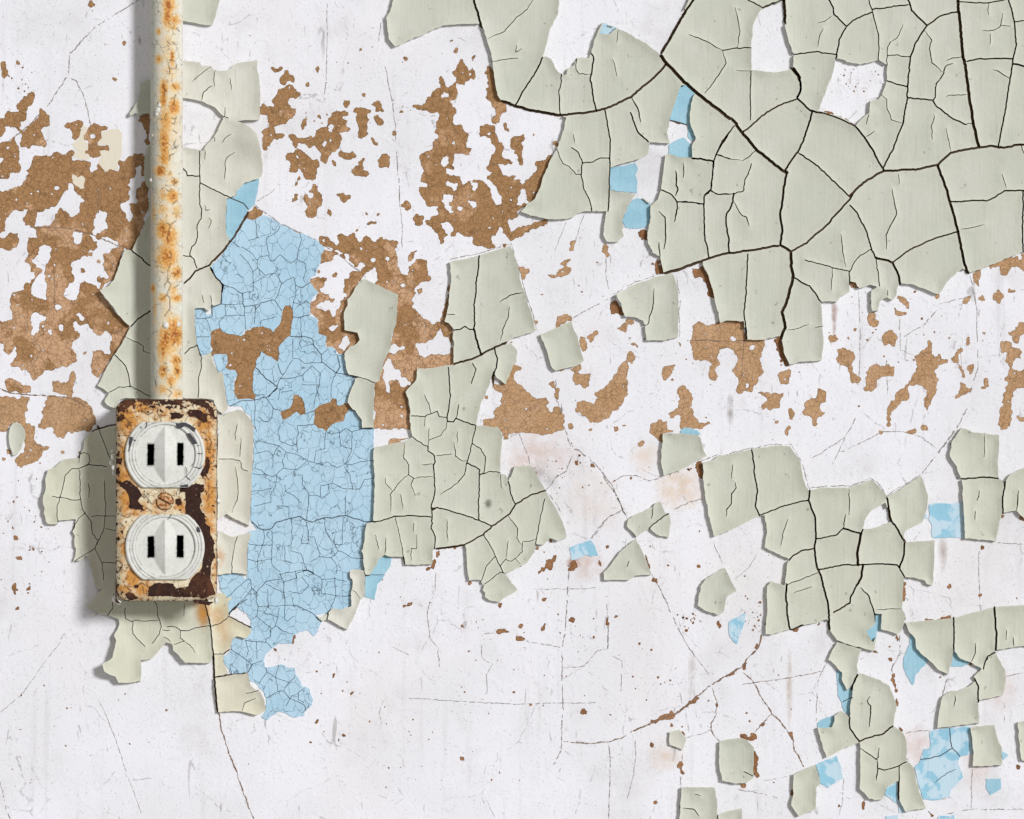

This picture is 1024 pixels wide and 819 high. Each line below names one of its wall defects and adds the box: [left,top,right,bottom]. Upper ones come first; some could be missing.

peeling [377,153,390,168]
peeling [0,77,151,409]
peeling [548,240,576,278]
peeling [541,314,598,388]
crack [473,0,1024,631]
peeling [963,288,1015,304]
peeling [176,423,197,444]
crack [0,66,701,819]
peeling [538,555,557,580]
peeling [567,502,671,583]
peeling [638,322,1024,819]
peeling [476,620,525,648]